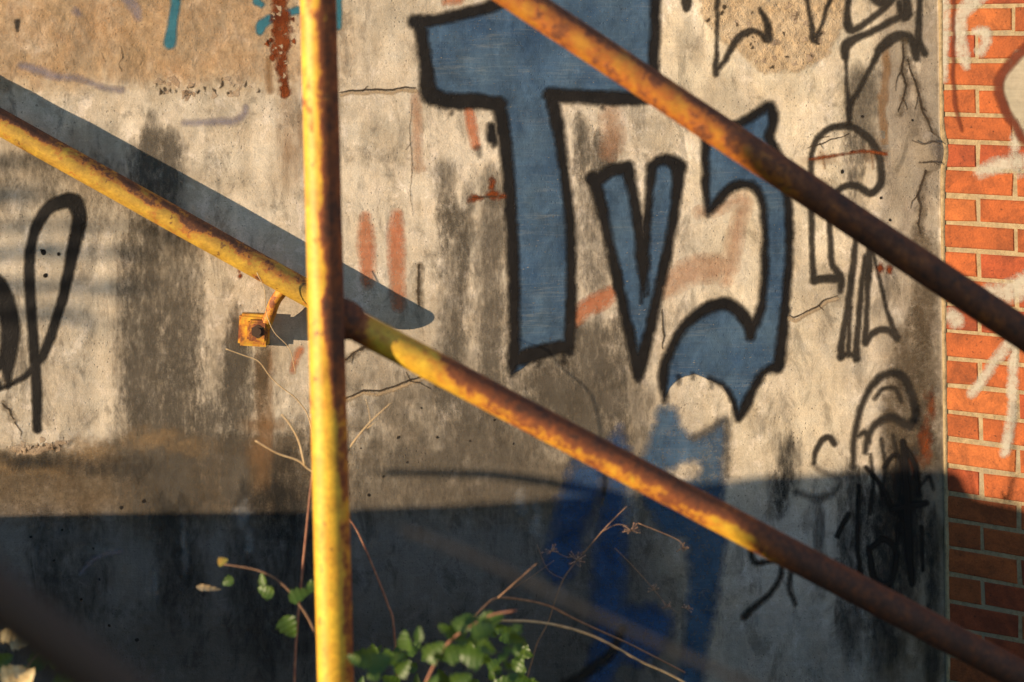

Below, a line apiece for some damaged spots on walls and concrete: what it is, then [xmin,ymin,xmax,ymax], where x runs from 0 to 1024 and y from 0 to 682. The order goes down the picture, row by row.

peeling [1,0,272,101]
rust [265,0,296,98]
crack [340,86,417,96]
peeling [701,0,845,73]
crack [895,40,936,136]
damp [134,113,183,205]
crack [910,170,928,235]
crack [789,296,839,322]
damp [0,219,315,655]